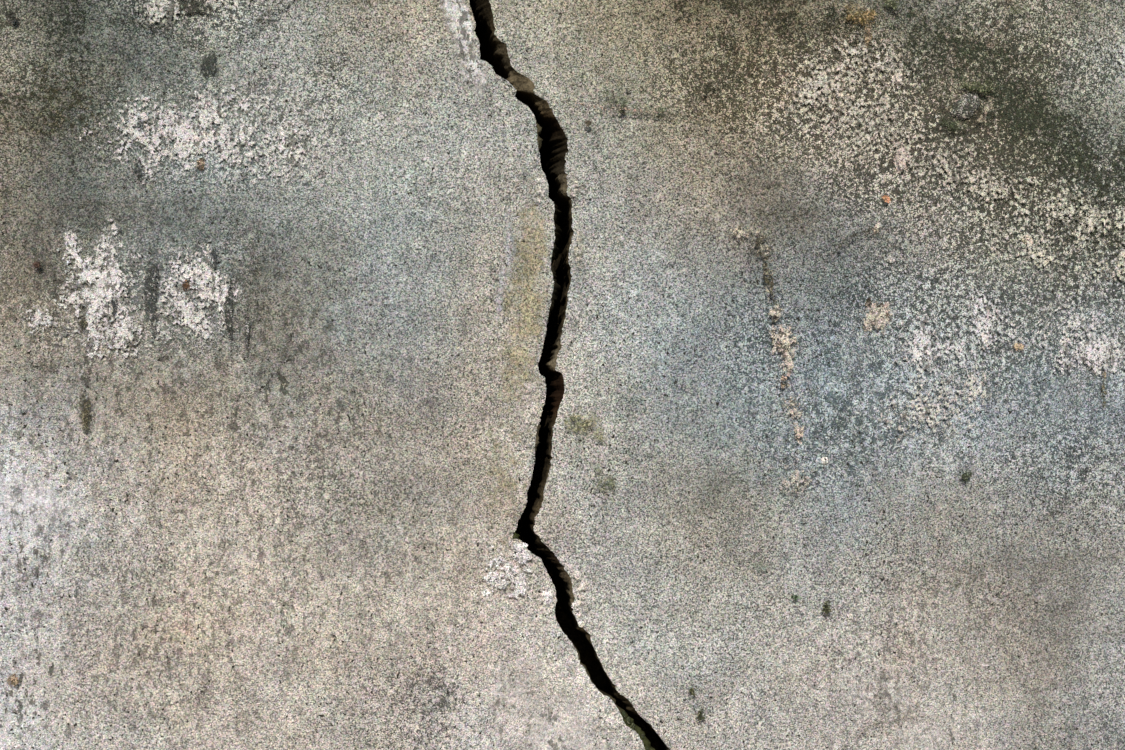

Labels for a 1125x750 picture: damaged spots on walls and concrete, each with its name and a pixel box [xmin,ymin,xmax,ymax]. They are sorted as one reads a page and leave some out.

crack [469,0,730,750]
water stain [629,0,1125,265]